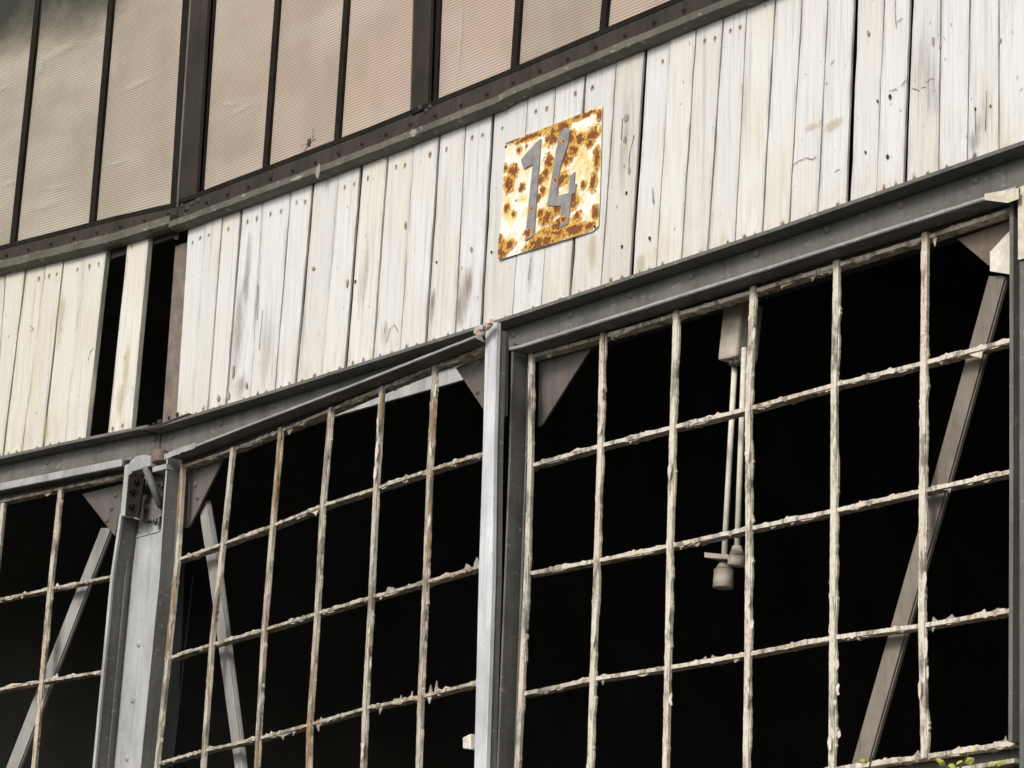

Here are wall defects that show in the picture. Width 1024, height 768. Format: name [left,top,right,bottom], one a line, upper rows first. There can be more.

rust [498,108,601,259]
peeling [918,636,929,701]